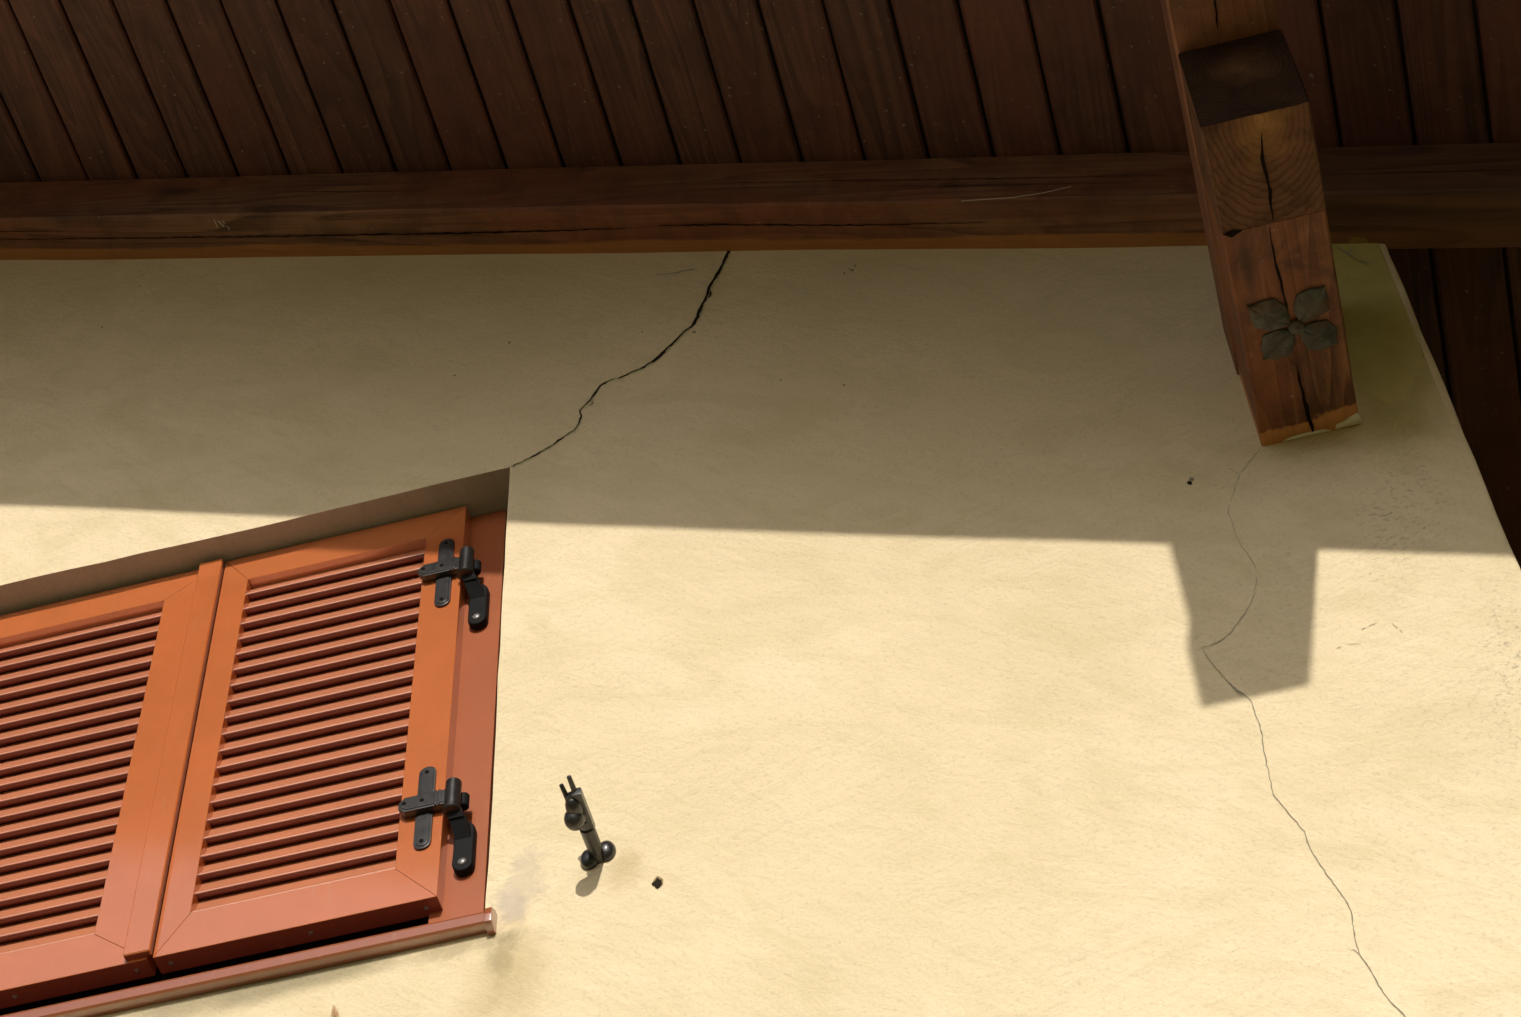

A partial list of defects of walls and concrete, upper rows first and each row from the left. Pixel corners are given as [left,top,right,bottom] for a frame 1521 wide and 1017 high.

crack [737,176,1101,187]
crack [0,222,983,467]
crack [1202,449,1406,1017]